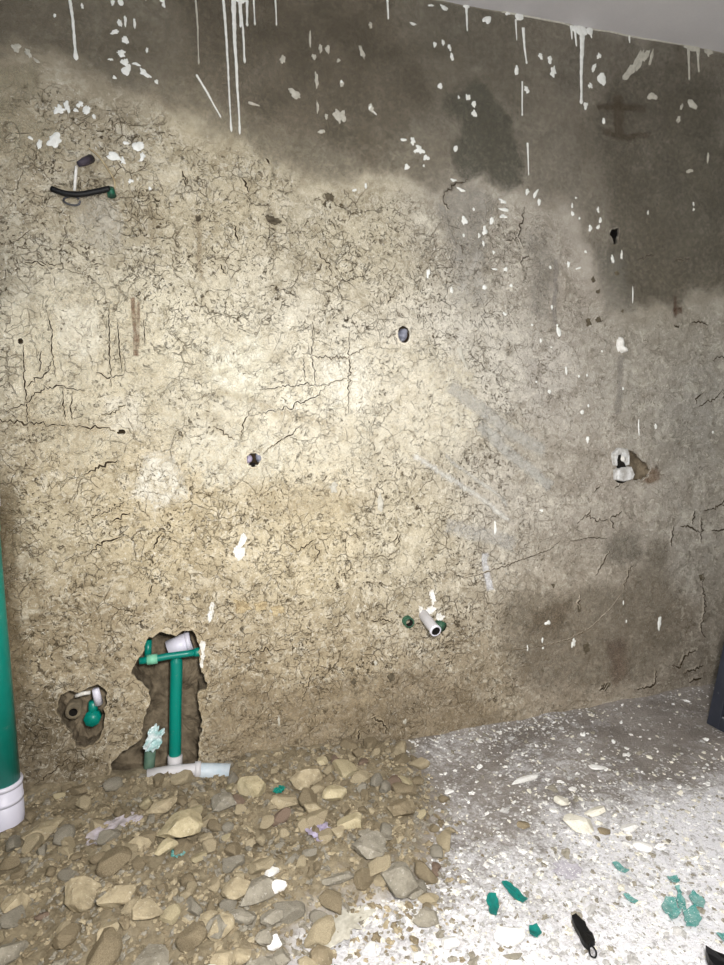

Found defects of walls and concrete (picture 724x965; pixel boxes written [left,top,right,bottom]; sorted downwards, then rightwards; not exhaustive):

water stain [0,0,724,295]
crack [441,178,467,211]
crack [0,304,147,432]
crack [213,322,366,452]
crack [84,459,120,476]
flaking render [626,448,651,482]
crack [86,501,130,557]
crack [286,538,322,562]
crack [463,483,634,590]
crack [668,498,724,547]
spalling [54,681,109,750]
spalling [107,627,210,775]